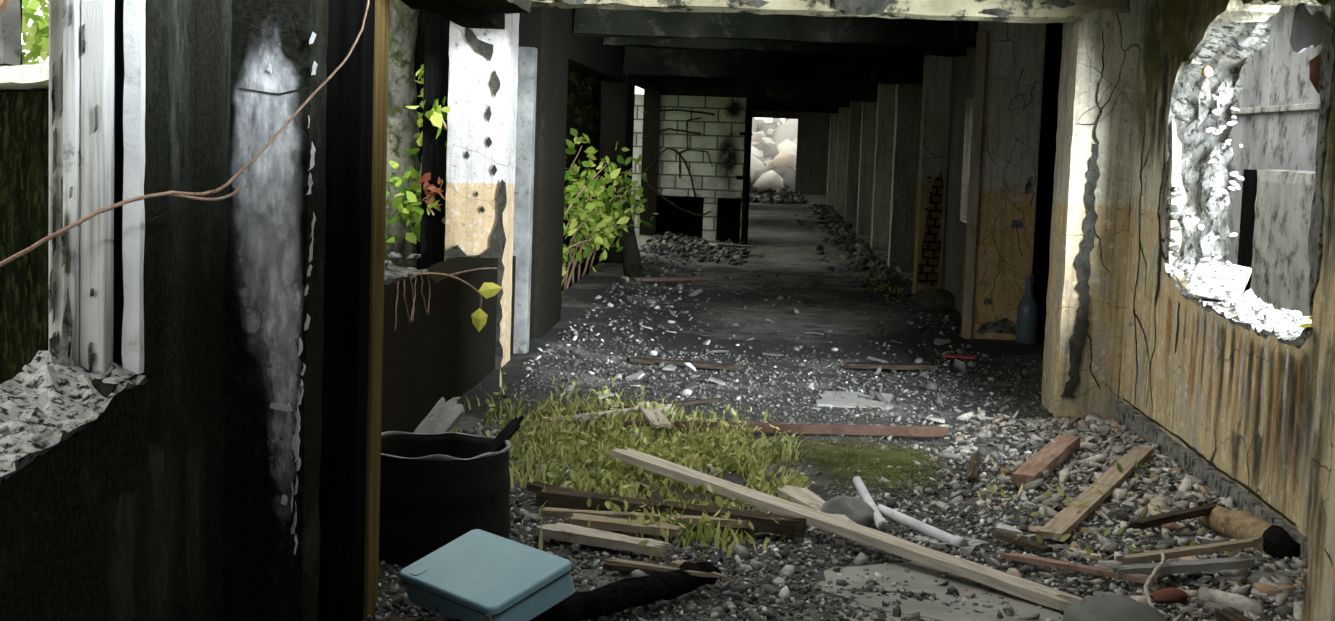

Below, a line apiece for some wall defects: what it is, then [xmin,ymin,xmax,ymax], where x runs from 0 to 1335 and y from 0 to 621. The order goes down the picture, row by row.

peeling [62,0,86,57]
spalling [0,52,150,486]
water stain [169,0,186,215]
water stain [227,0,298,475]
peeling [444,164,507,369]
peeling [465,28,501,148]
peeling [978,0,1015,18]
crack [975,68,1037,321]
crack [1060,30,1296,527]
water stain [1138,0,1335,266]
spalling [1162,22,1335,349]
water stain [1183,314,1334,621]